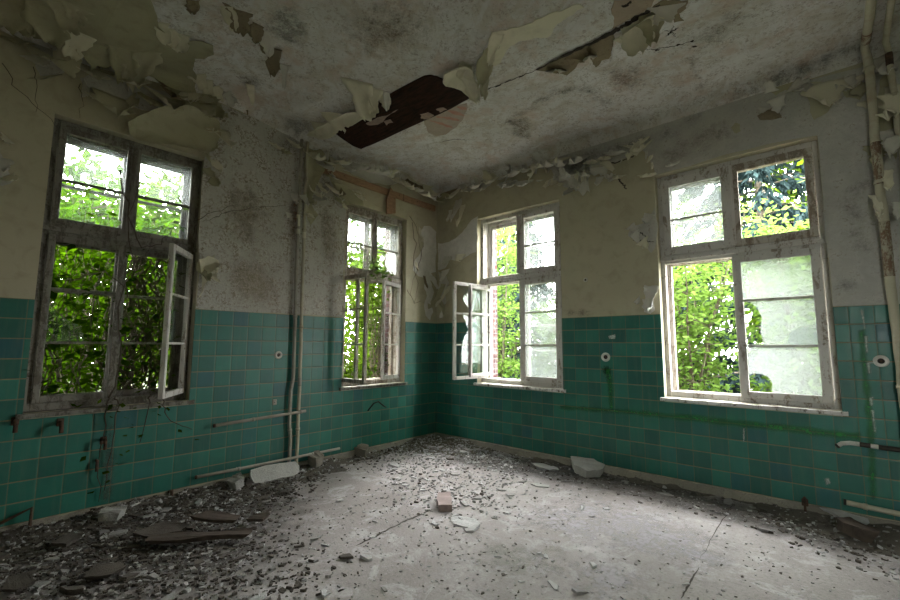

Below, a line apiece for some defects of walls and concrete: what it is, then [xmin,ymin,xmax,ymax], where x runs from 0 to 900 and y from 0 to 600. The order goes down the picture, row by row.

peeling [0,0,478,320]
peeling [424,31,504,136]
flaking render [536,0,688,75]
peeling [757,93,787,120]
peeling [835,51,900,191]
corrosion [878,221,896,277]
crack [681,506,732,598]